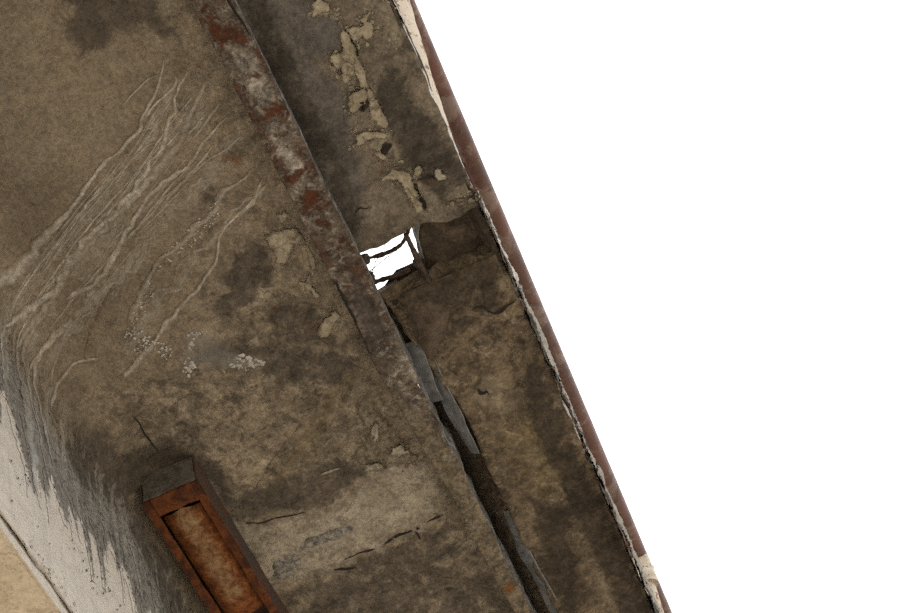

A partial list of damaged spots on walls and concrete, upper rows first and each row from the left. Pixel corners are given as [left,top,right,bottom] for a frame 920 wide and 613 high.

rust [233,56,297,158]
peeling [307,0,423,214]
leakage [0,58,245,613]
efflorescence [120,168,280,387]
spalling [435,169,661,613]
crack [245,512,306,524]
crack [333,514,443,571]